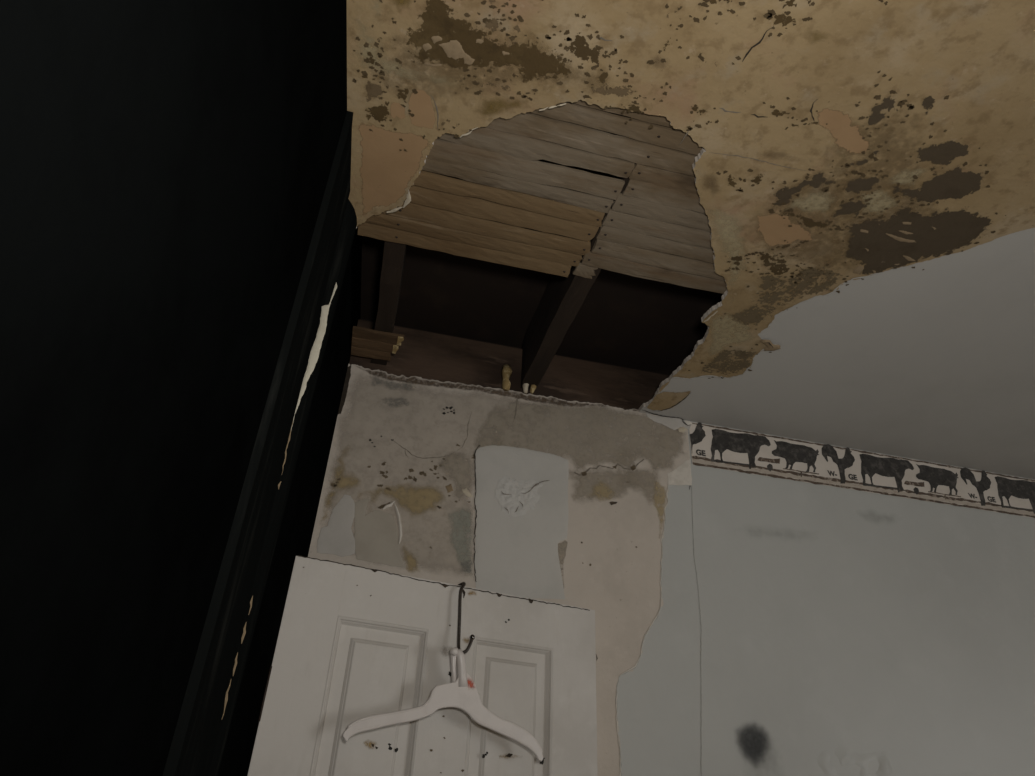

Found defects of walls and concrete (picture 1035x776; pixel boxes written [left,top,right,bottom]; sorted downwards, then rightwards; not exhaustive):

peeling [278,283,337,489]
peeling [303,0,1035,776]
spalling [221,596,253,720]